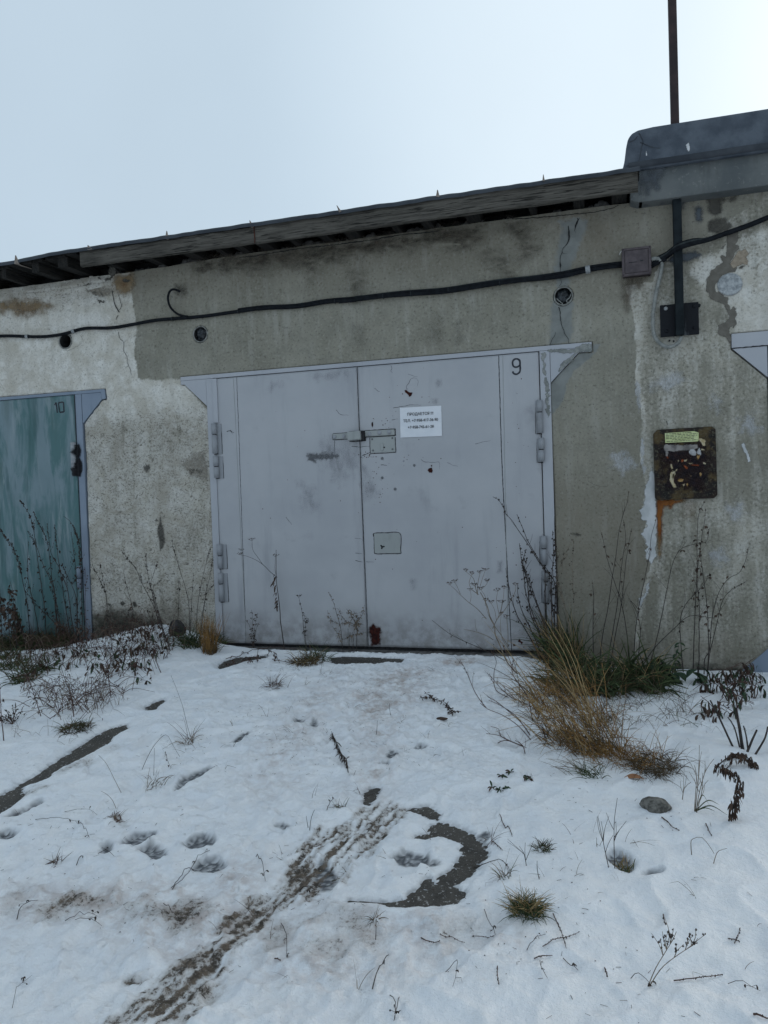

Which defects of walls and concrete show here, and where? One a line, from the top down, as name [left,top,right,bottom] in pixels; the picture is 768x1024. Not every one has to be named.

crack [512,205,619,344]
peeling [706,218,748,343]
peeling [612,439,657,564]
corrosion [656,499,686,557]
corrosion [369,624,382,646]